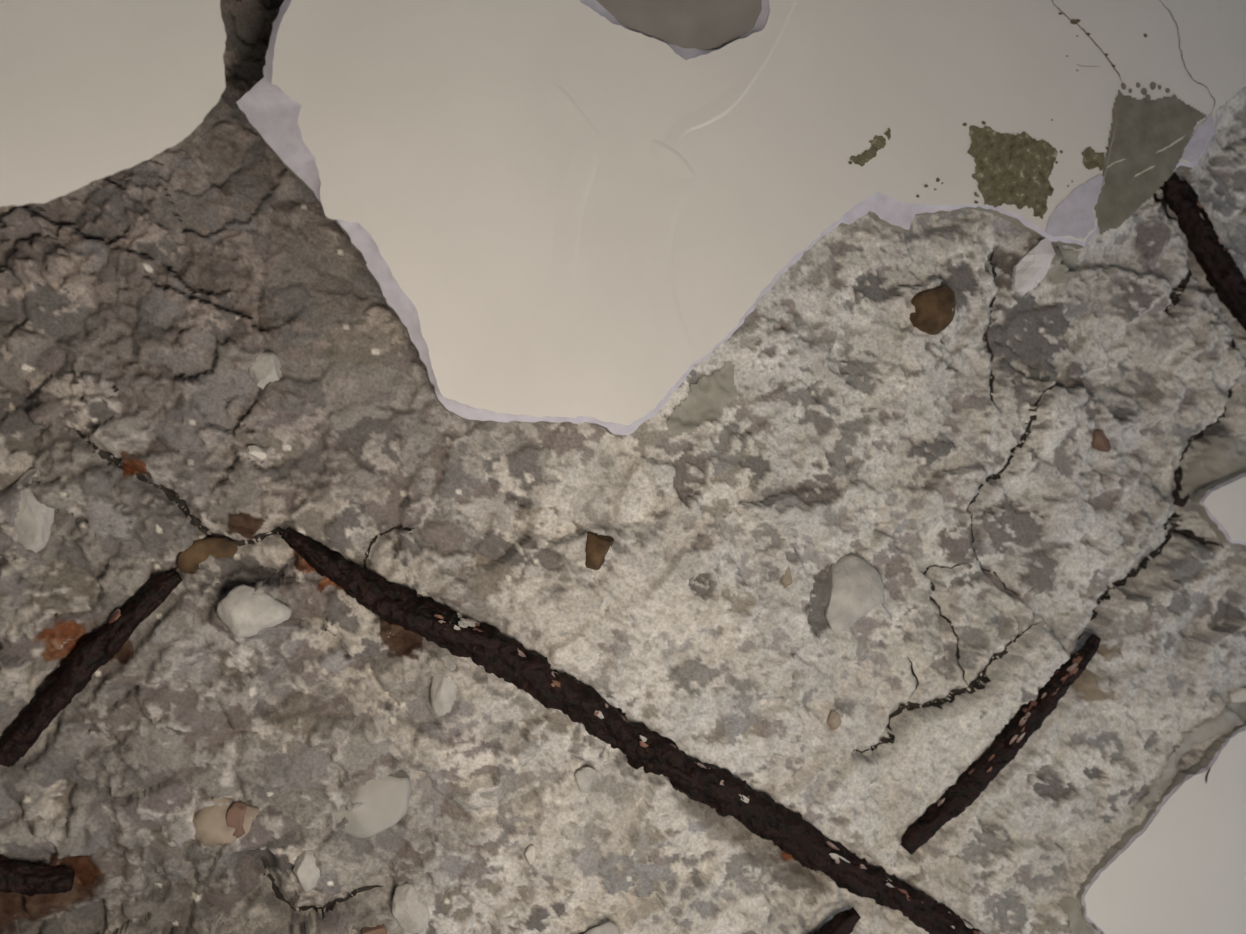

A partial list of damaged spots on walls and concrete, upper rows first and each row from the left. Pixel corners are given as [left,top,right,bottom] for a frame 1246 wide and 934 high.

crack [1052,0,1121,80]
peeling [1045,88,1246,284]
crack [1165,253,1192,321]
spalling [12,467,55,553]
rust [228,513,265,539]
crack [854,245,1055,753]
crack [1075,321,1244,652]
rust [37,621,86,662]
spalling [216,584,292,638]
rust [380,618,423,660]
spalling [281,527,984,934]
rust [0,854,104,934]